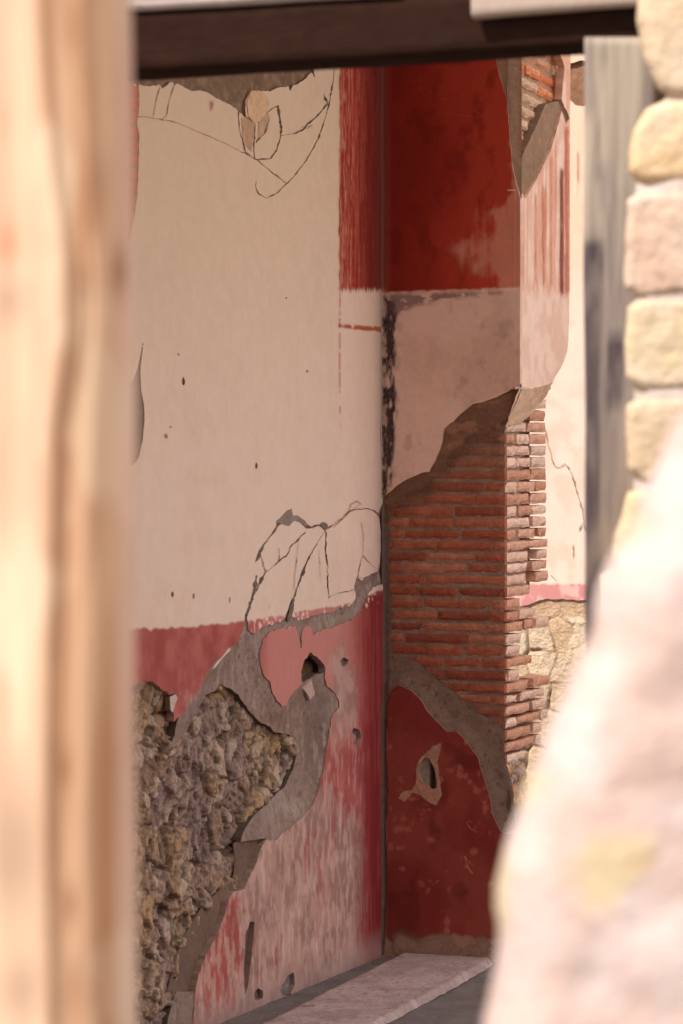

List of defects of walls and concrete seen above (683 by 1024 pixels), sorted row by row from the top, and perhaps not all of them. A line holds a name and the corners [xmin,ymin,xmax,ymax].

flaking render [133,71,311,203]
crack [137,69,335,198]
flaking render [497,57,584,197]
damp [380,297,396,496]
crack [545,430,585,556]
crack [245,500,379,626]
flaking render [136,381,585,1024]